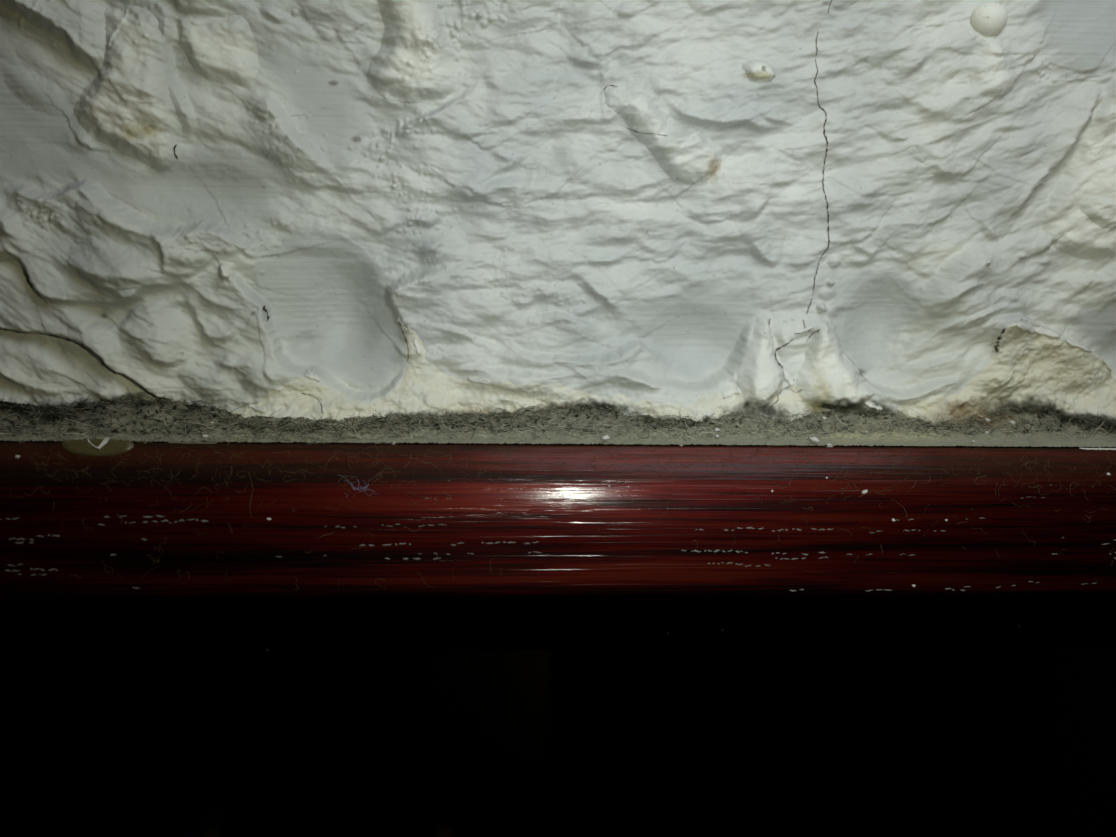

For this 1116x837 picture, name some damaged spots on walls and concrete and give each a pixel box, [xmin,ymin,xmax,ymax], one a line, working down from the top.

crack [769,0,832,413]
damp [948,397,1116,424]